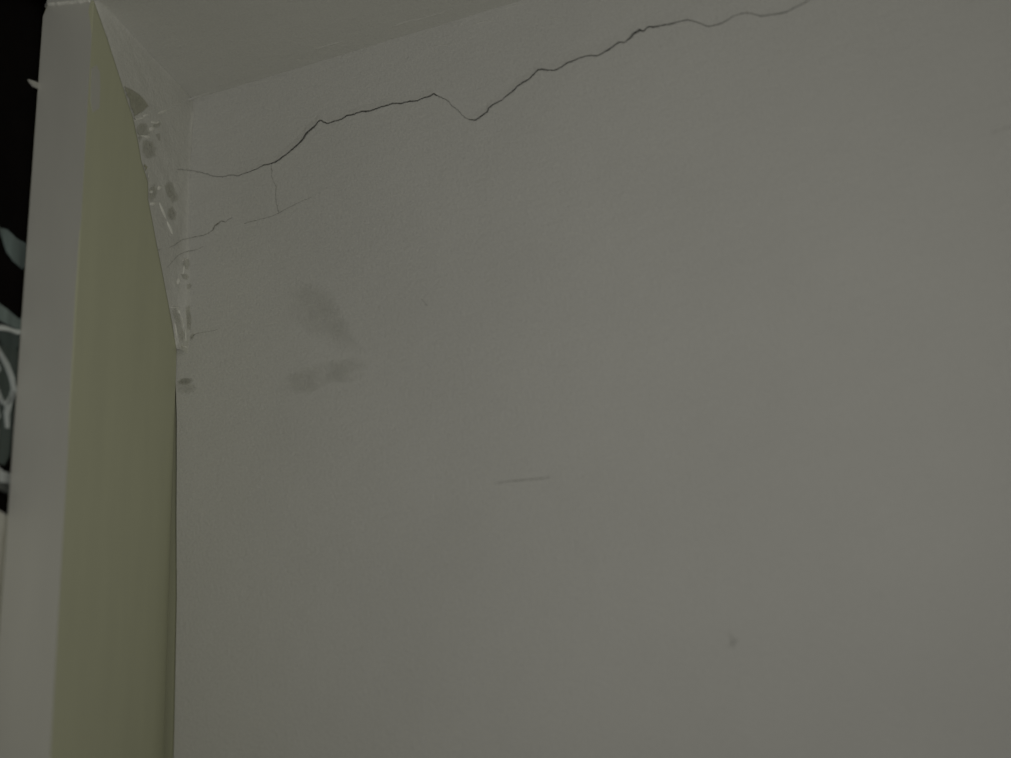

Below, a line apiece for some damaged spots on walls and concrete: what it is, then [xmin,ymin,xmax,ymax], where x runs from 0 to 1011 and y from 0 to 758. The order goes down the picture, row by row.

crack [190,0,807,177]